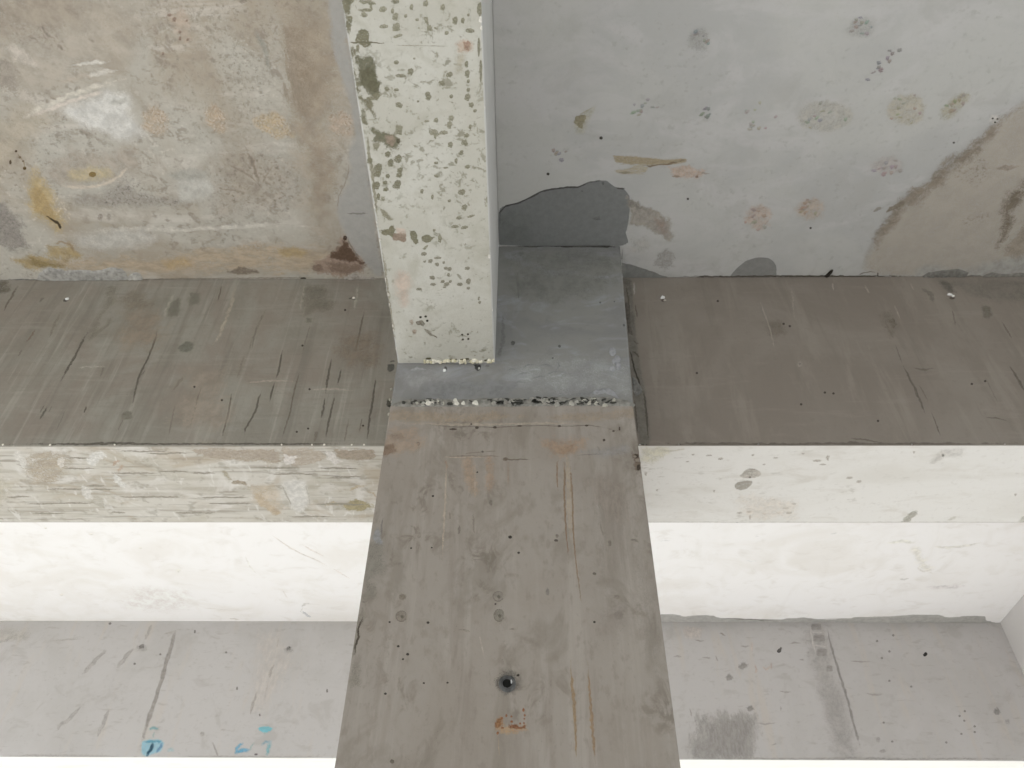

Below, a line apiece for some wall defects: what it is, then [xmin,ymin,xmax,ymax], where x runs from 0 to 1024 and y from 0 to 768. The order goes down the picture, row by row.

flaking render [498,180,667,278]
leakage [861,100,1024,319]
crack [61,332,88,381]
crack [132,331,157,404]
crack [222,353,299,438]
crack [321,361,341,435]
crack [367,380,377,438]
crack [136,632,176,757]
corrosion [494,708,527,754]
crack [828,632,861,748]